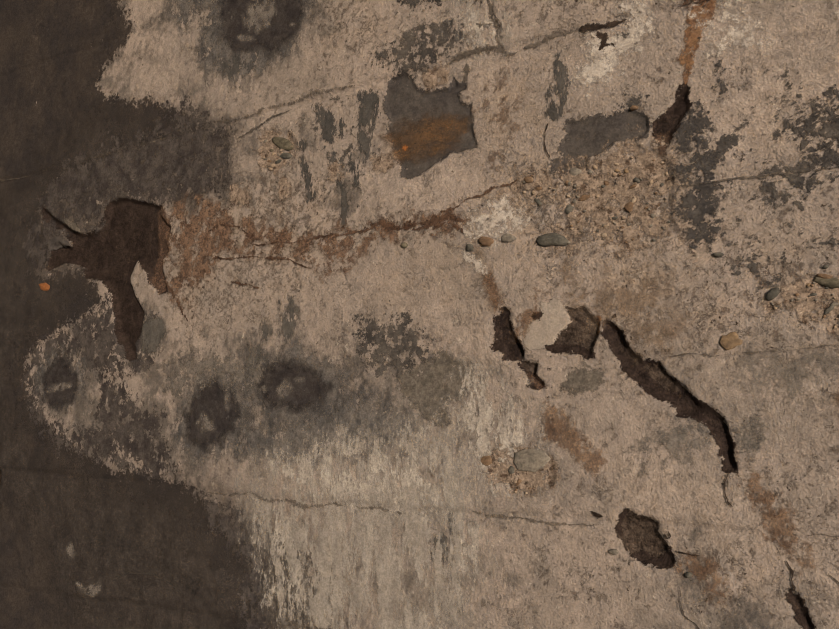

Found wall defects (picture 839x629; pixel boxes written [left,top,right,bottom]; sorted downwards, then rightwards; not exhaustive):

leakage [167,0,315,88]
rust [676,0,717,84]
leakage [297,85,386,230]
spalling [484,83,693,260]
spalling [41,197,171,361]
rust [162,193,471,316]
leakage [35,297,546,629]
crack [208,492,401,515]
spalling [490,305,546,390]
crack [473,511,603,526]
spalling [544,304,739,507]
spalling [614,508,676,569]